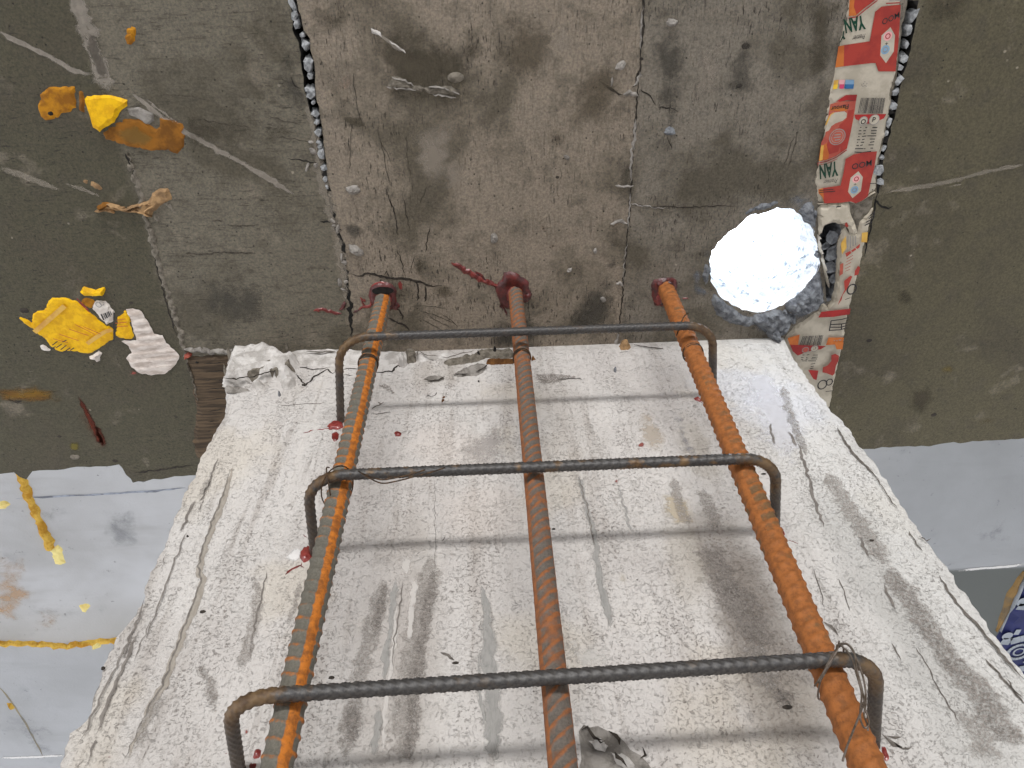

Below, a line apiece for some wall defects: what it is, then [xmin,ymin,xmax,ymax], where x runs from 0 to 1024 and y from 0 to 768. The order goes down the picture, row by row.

crack [159,0,457,337]
crack [574,0,731,353]
spalling [695,199,841,343]
crack [864,0,920,256]
spalling [279,294,394,687]
spalling [423,286,582,670]
spalling [658,281,838,653]
damp [349,556,441,682]
damp [371,694,420,759]
damp [478,586,497,674]
damp [478,689,503,755]
spalling [541,684,651,768]